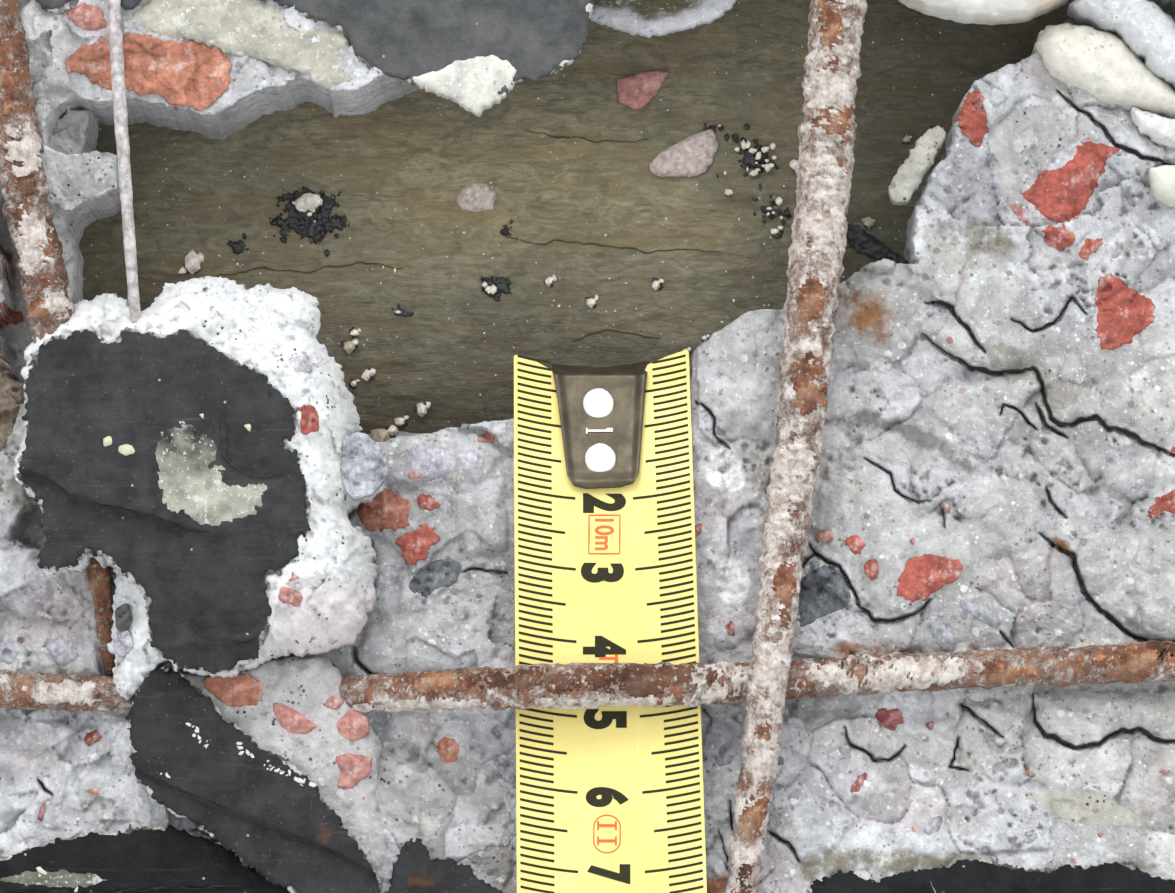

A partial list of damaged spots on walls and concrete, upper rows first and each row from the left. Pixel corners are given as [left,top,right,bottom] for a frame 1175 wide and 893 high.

peeling [36,0,74,15]
peeling [120,0,736,117]
rust [811,105,854,144]
crack [1057,91,1170,165]
spalling [55,154,119,217]
peeling [888,126,946,206]
rust [790,351,828,416]
crack [923,297,1175,455]
rust [768,558,800,630]
crack [1040,489,1175,642]
rust [380,663,729,699]
crack [1032,694,1175,749]